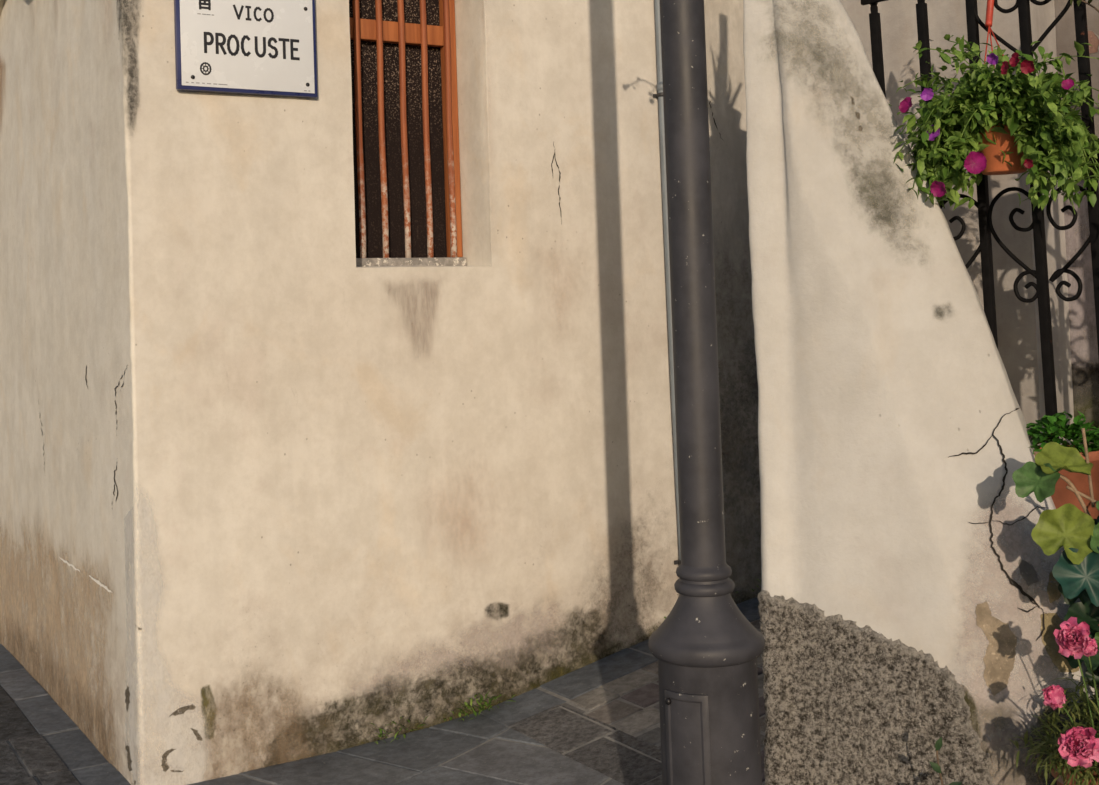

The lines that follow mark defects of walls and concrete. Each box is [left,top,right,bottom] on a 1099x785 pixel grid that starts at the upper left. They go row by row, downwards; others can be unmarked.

leakage [117,0,138,124]
leakage [792,0,887,143]
crack [551,143,562,225]
leakage [859,161,912,227]
crack [948,408,1048,641]
leakage [0,528,114,764]
flaking render [161,749,183,772]
flaking render [169,704,196,717]
leakage [228,595,620,771]
peeling [973,598,1017,698]
peeling [1017,557,1080,674]